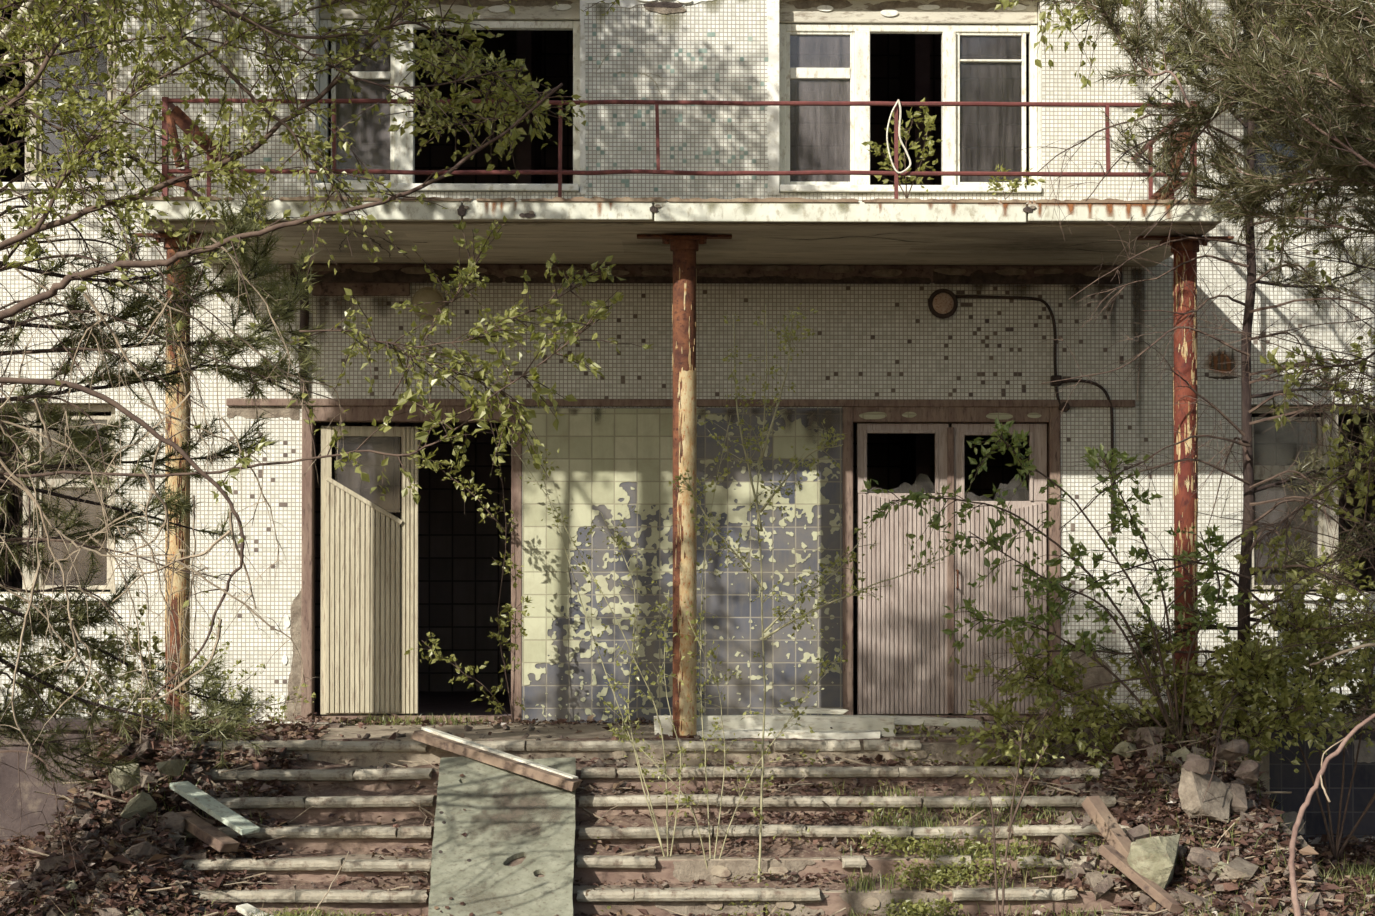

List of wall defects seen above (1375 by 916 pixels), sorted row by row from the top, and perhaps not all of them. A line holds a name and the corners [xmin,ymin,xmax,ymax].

spalling [638,0,692,14]
corrosion [978,200,1212,217]
peeling [290,265,1124,796]